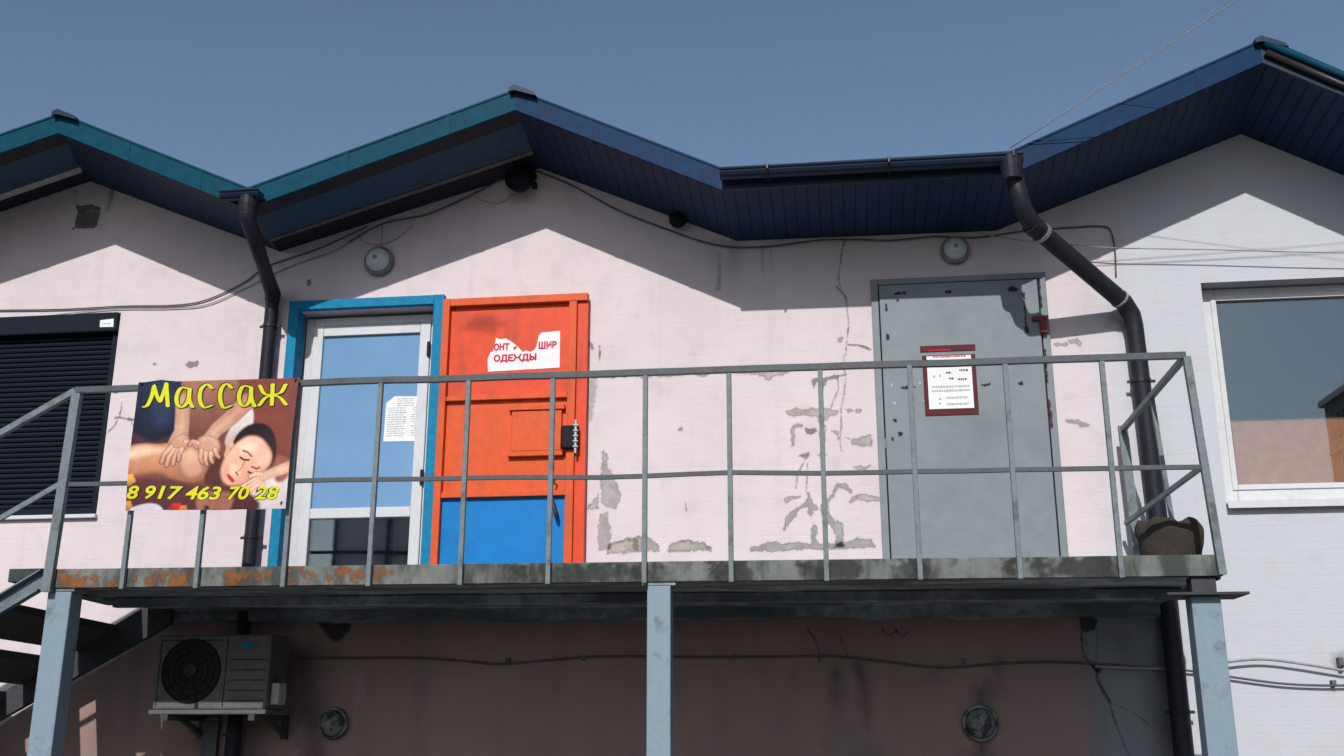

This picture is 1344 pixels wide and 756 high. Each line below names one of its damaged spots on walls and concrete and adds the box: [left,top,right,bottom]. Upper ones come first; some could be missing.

spalling [72,204,100,230]
crack [824,241,870,438]
peeling [786,407,872,458]
peeling [587,451,712,554]
peeling [751,483,880,552]
corrosion [58,572,194,587]
corrosion [222,566,364,586]